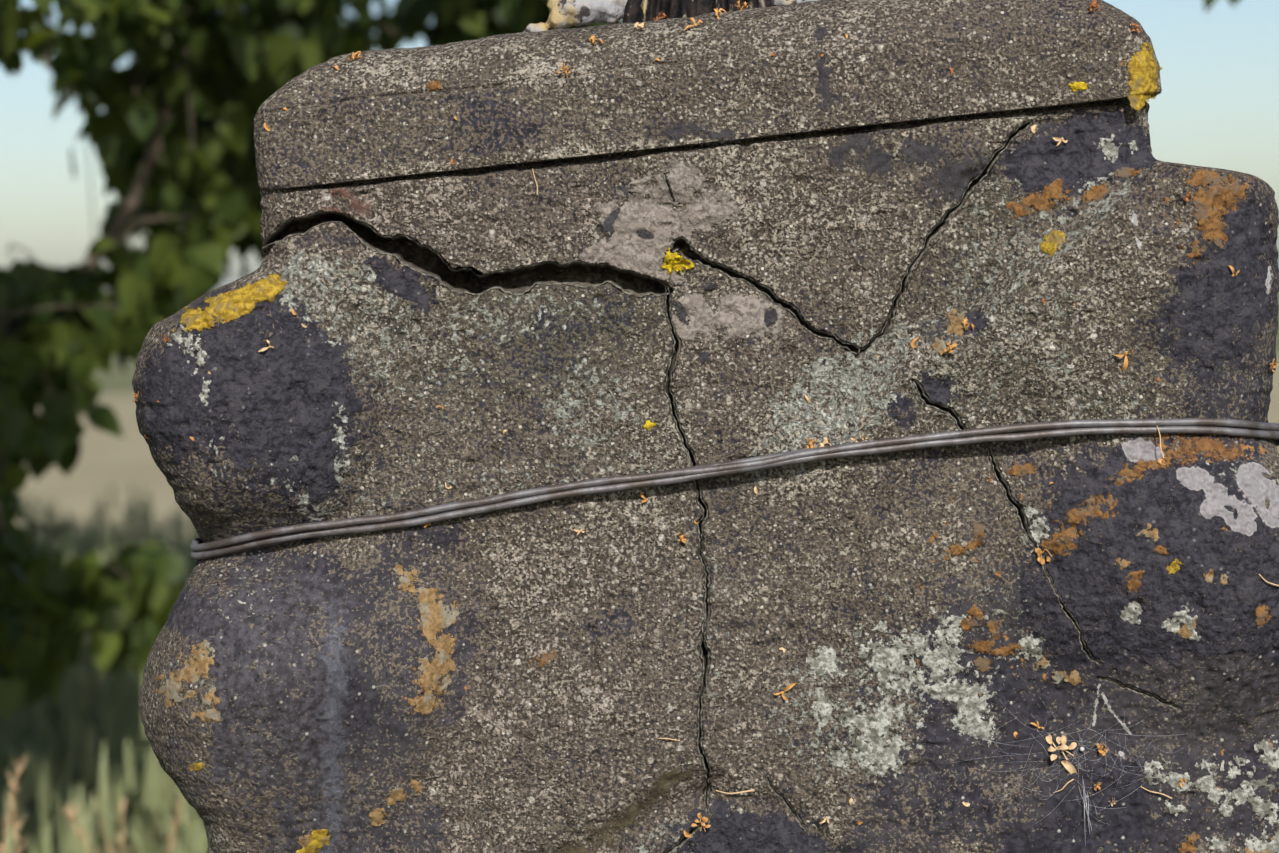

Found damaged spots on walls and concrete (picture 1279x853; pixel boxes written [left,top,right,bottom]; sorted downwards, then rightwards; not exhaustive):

crack [664,174,674,201]
crack [671,120,1032,357]
crack [264,211,712,853]
crack [913,381,1181,710]
crack [760,769,808,831]